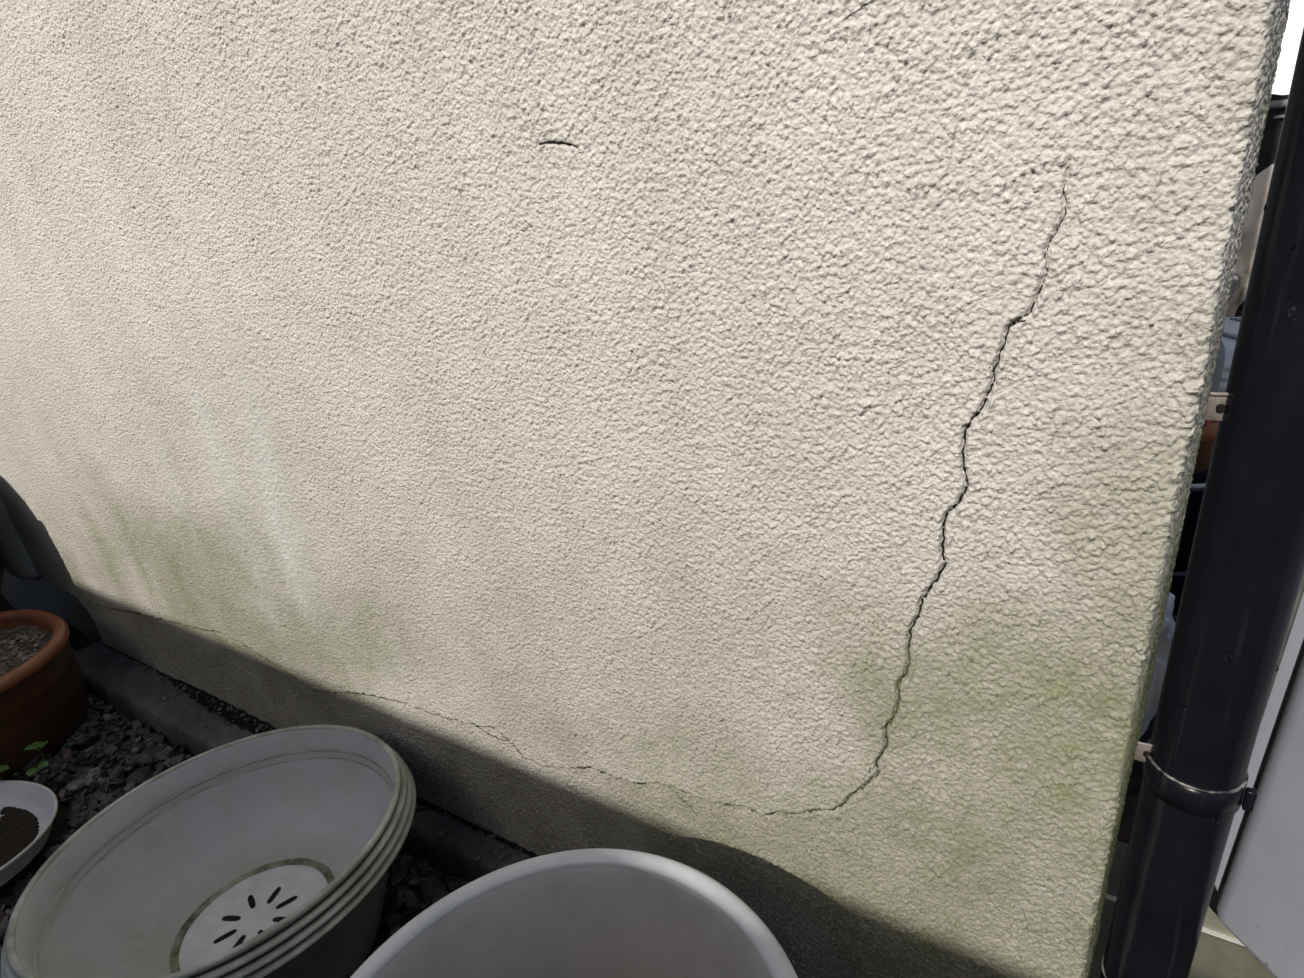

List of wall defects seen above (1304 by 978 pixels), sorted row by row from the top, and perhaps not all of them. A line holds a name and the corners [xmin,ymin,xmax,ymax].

crack [351,172,1068,817]